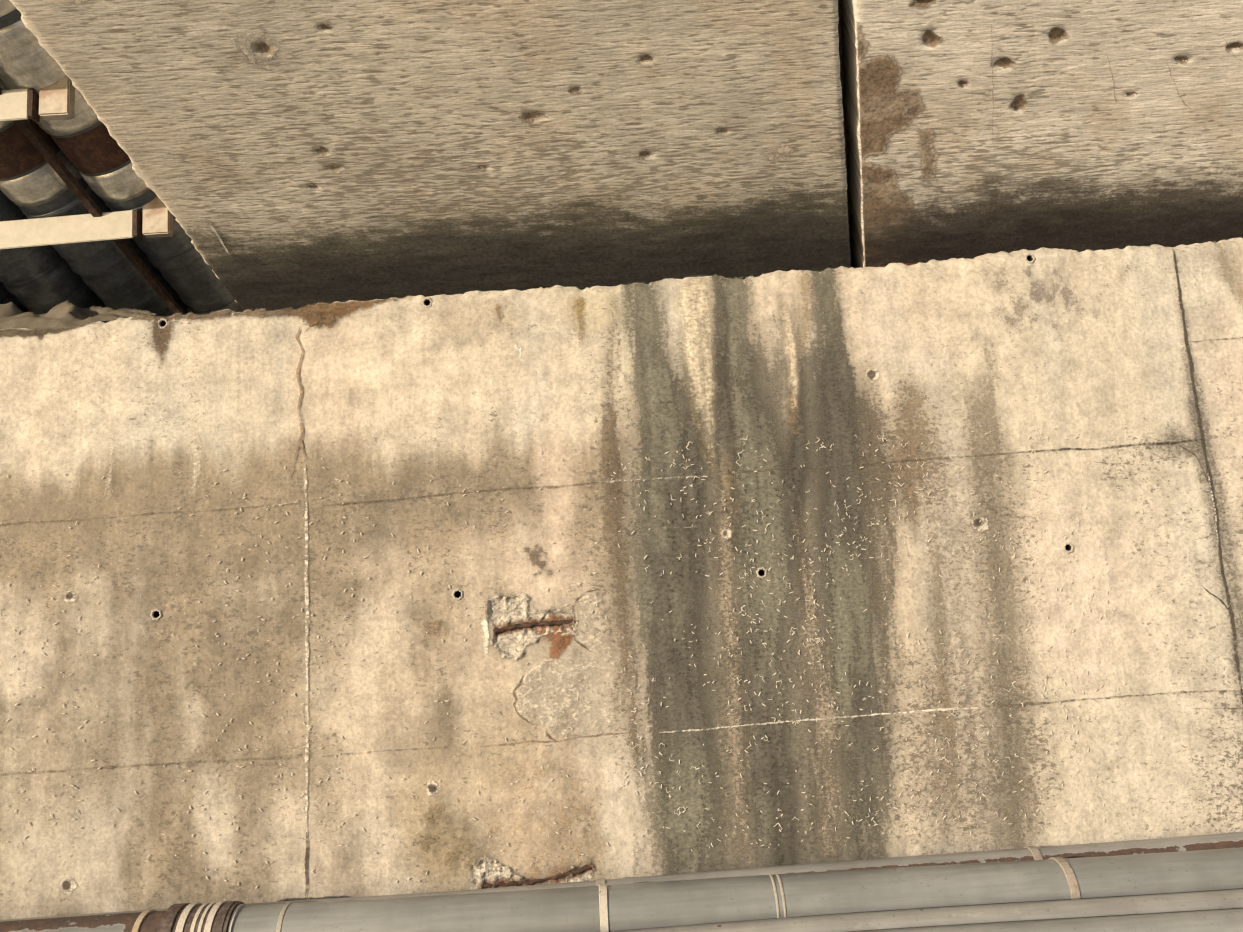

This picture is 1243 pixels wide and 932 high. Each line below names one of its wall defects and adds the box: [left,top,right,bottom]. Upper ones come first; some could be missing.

crack [289,319,321,479]
spalling [485,590,723,815]
damp [131,173,1243,875]
peeling [609,434,1024,759]
peeling [663,568,1127,848]
crack [1018,248,1243,704]
crack [303,832,311,898]
spalling [470,856,595,889]